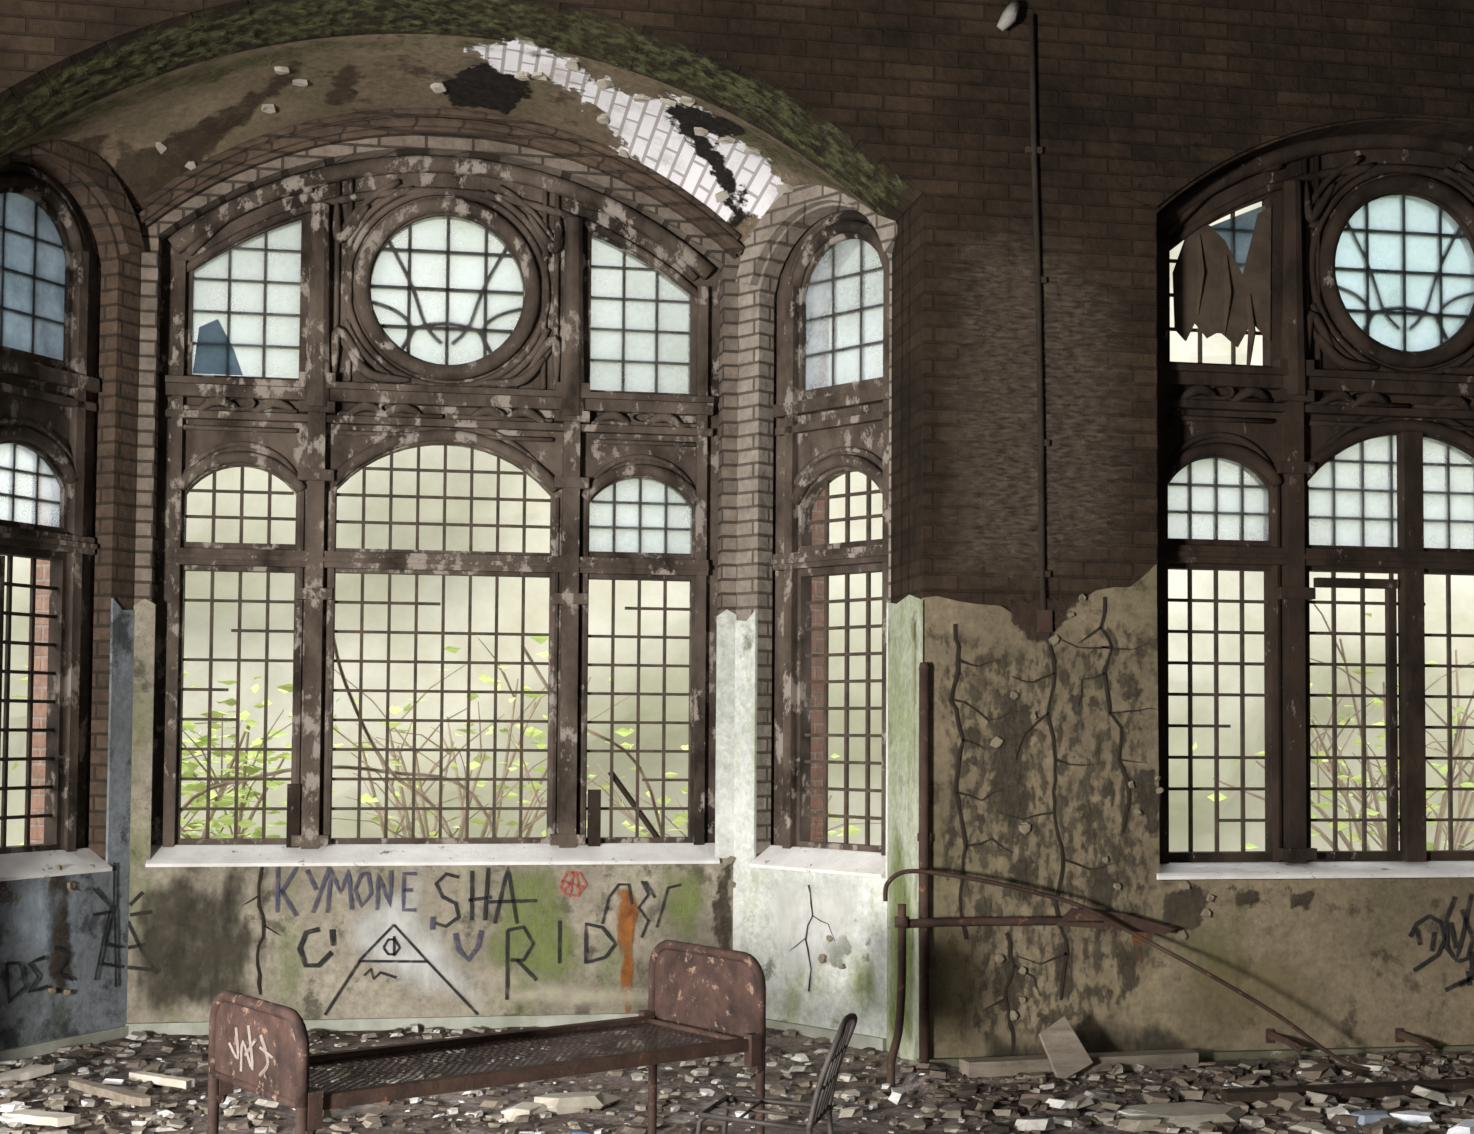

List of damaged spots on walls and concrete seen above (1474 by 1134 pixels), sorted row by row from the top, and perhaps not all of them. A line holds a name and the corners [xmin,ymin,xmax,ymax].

flaking render [430,37,793,227]
flaking render [1007,594,1086,645]
spalling [1163,880,1259,940]
spalling [1288,887,1314,910]
crack [791,885,835,992]
leakage [990,1040,1045,1057]
leakage [1076,1027,1182,1053]